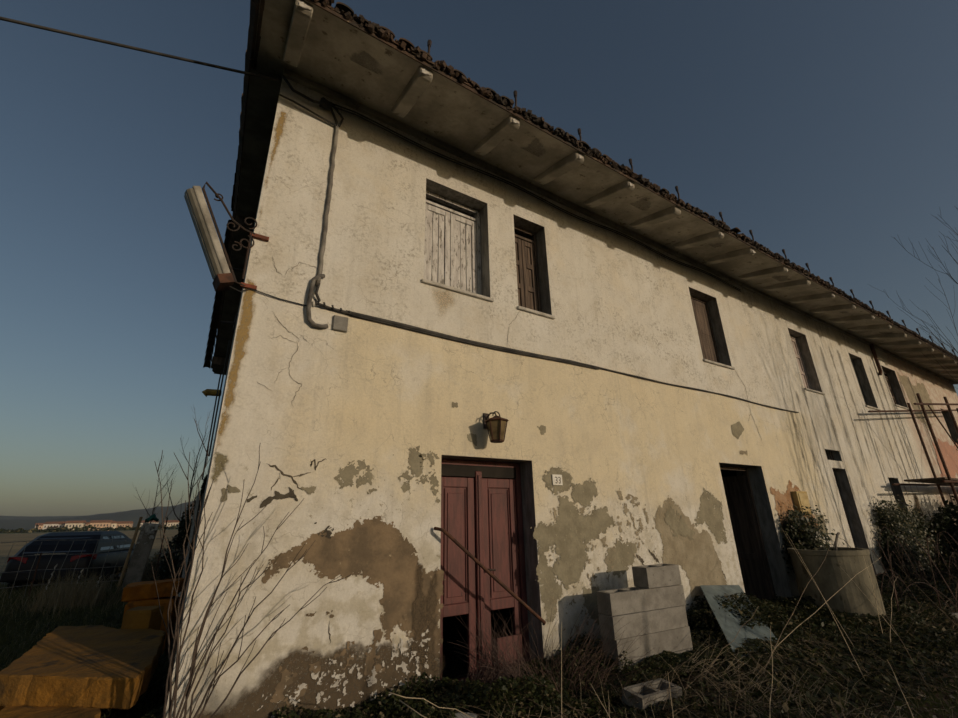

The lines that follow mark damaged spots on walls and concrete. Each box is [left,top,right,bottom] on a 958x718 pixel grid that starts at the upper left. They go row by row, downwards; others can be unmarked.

crack [257,314,309,407]
crack [266,463,311,490]
peeling [334,459,377,494]
peeling [398,446,440,503]
flaking render [770,480,820,530]
flaking render [531,466,727,631]
flaking render [257,516,446,718]